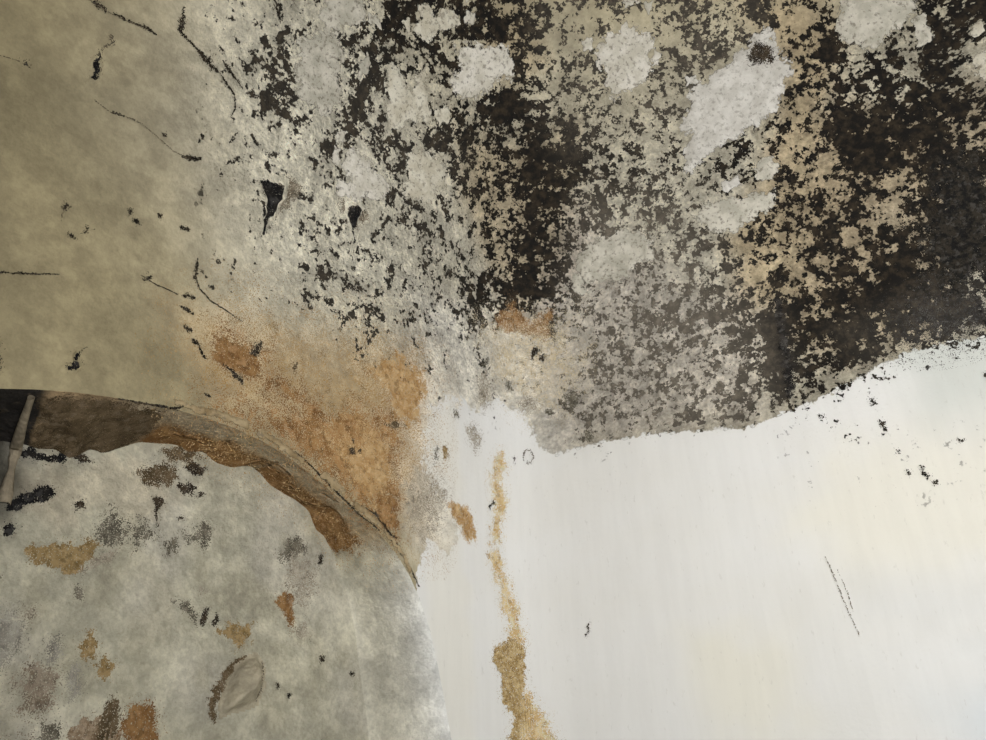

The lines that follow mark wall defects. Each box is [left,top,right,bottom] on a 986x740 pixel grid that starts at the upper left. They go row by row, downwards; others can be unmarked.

crack [90,0,243,116]
water stain [27,0,986,593]
peeling [527,345,546,365]
peeling [453,357,582,454]
spalling [0,484,59,538]
spalling [21,446,95,466]
spalling [23,531,122,580]
spalling [118,398,477,587]